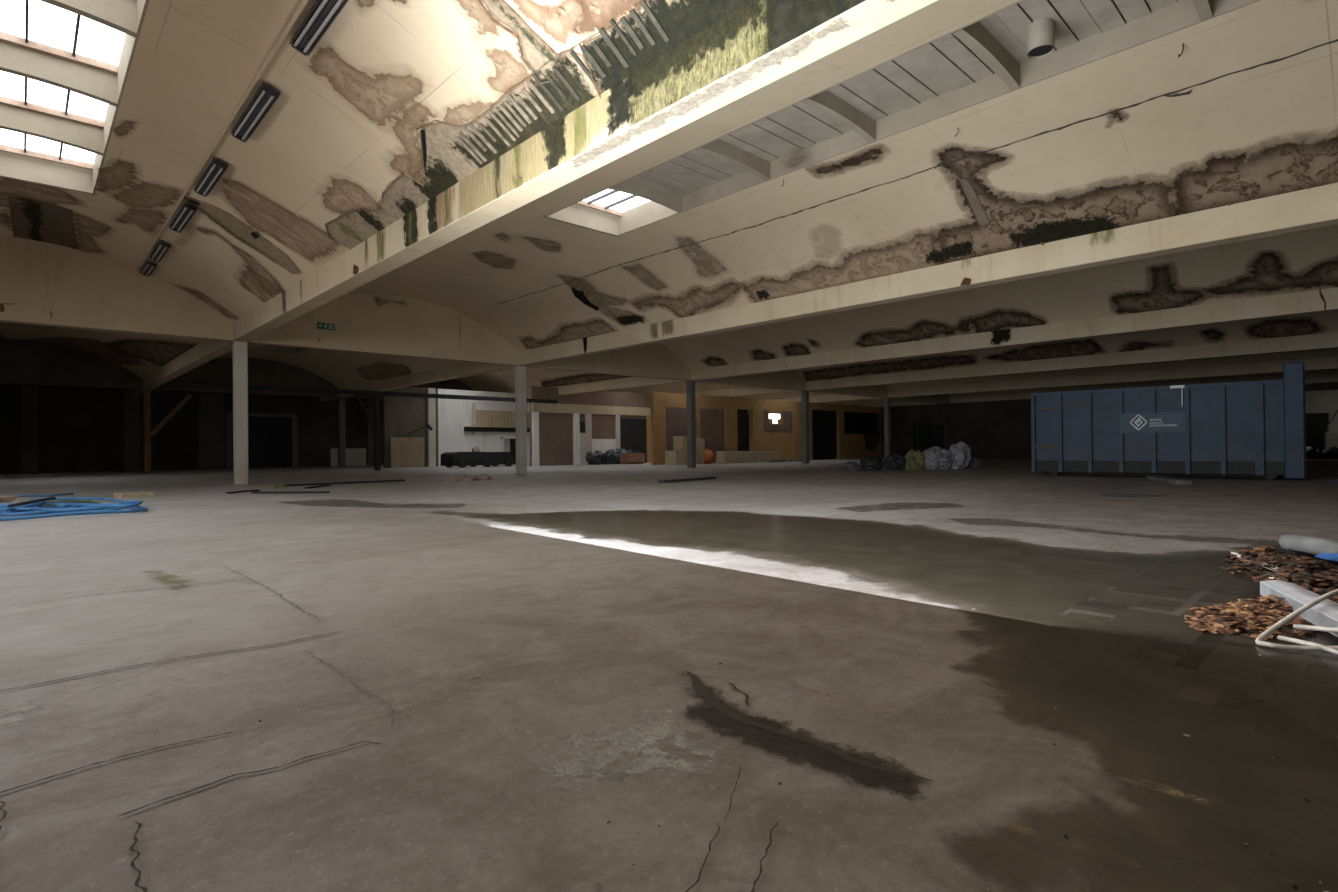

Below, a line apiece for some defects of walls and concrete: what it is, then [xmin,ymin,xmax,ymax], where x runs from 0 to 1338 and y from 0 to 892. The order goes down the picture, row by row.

damp [513,0,647,44]
damp [309,0,532,181]
spalling [325,0,750,249]
damp [541,107,585,170]
damp [607,74,636,137]
spalling [571,18,849,167]
damp [473,233,515,269]
damp [839,502,1279,545]
crack [681,671,934,892]
crack [0,801,8,829]
crack [129,821,148,892]